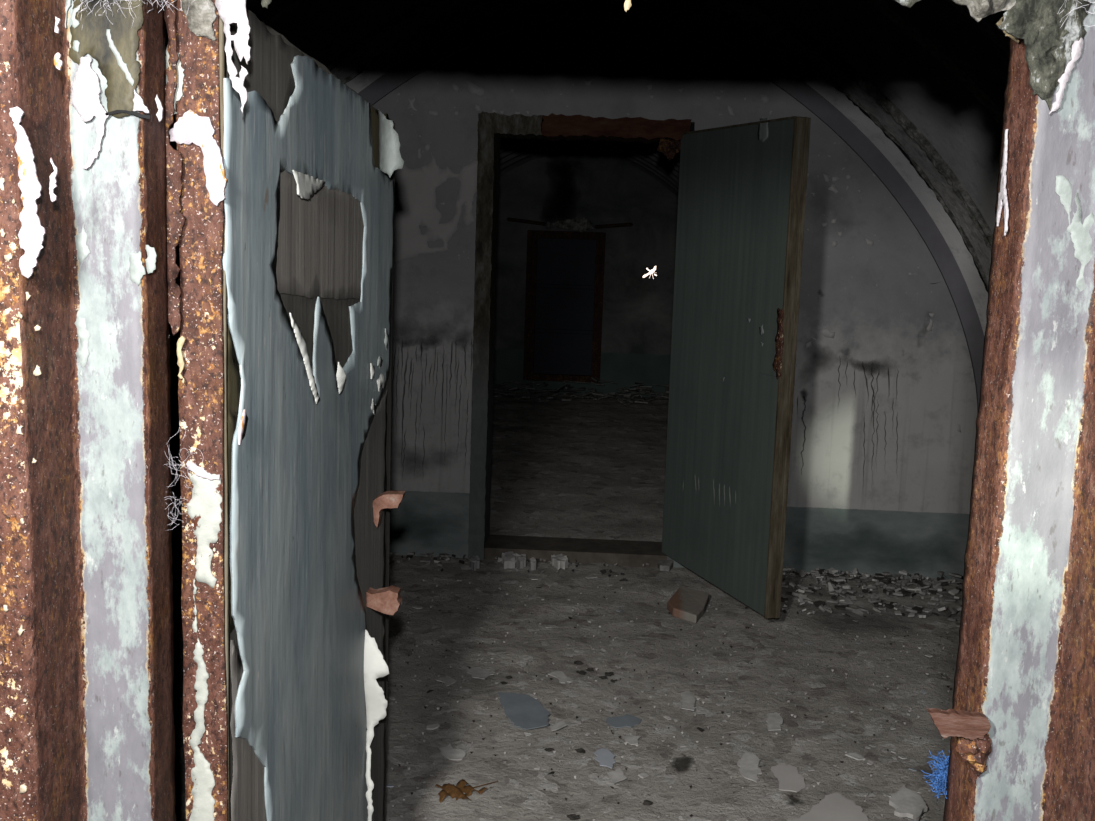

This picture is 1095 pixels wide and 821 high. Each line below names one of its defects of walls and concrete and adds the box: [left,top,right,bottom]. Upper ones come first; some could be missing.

peeling [54,0,228,206]
peeling [1048,37,1083,115]
peeling [0,107,58,278]
peeling [75,222,91,267]
peeling [129,245,157,285]
peeling [74,317,90,377]
rust [772,308,784,379]
spalling [238,410,248,445]
damp [838,364,898,475]
spalling [186,461,223,821]